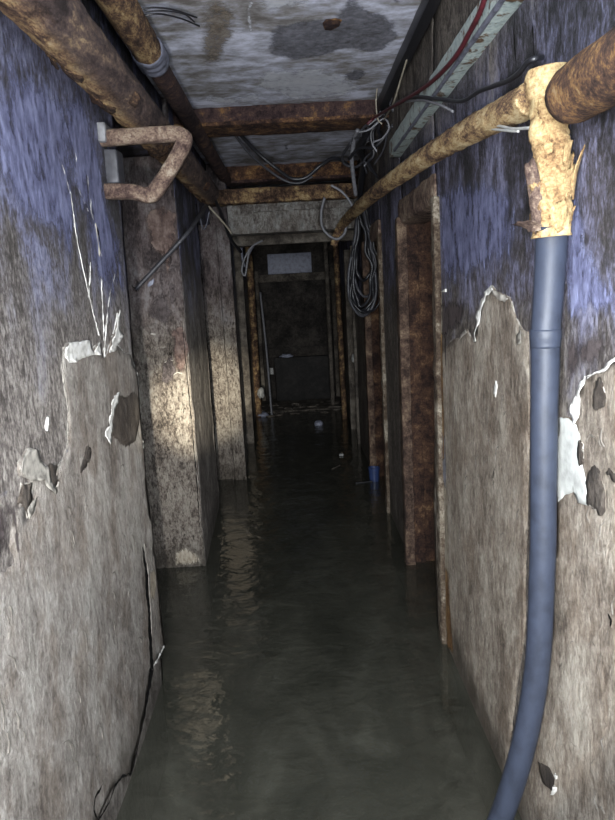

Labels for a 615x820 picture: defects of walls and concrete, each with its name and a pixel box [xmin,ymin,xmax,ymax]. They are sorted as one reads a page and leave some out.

damp [271,0,397,60]
peeling [0,310,173,820]
crack [94,544,165,820]
peeling [434,285,530,774]
peeling [518,357,615,820]